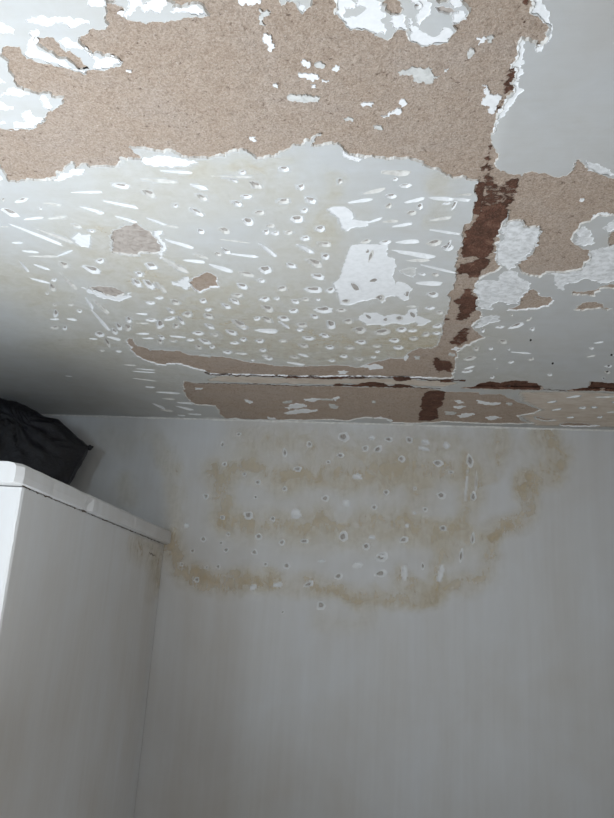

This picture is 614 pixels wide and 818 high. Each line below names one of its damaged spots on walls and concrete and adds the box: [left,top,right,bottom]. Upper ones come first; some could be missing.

corrosion [497,68,516,113]
spalling [0,0,614,427]
corrosion [456,146,519,278]
corrosion [444,289,478,346]
corrosion [567,381,614,392]